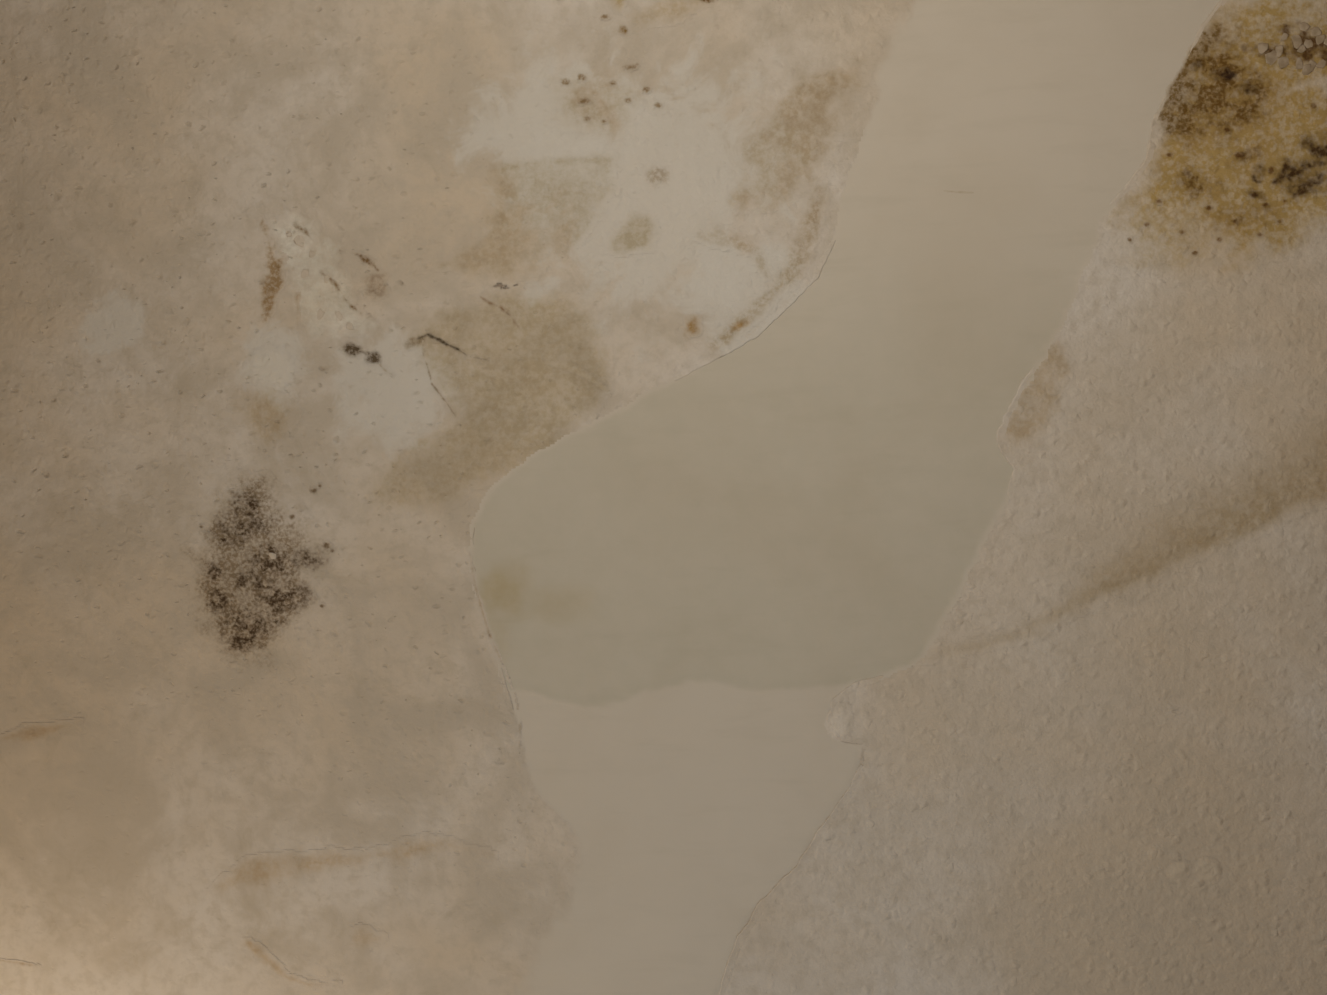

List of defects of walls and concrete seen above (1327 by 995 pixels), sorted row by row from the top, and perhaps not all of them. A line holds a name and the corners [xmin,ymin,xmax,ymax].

mould [1097,0,1327,296]
water stain [174,382,337,677]